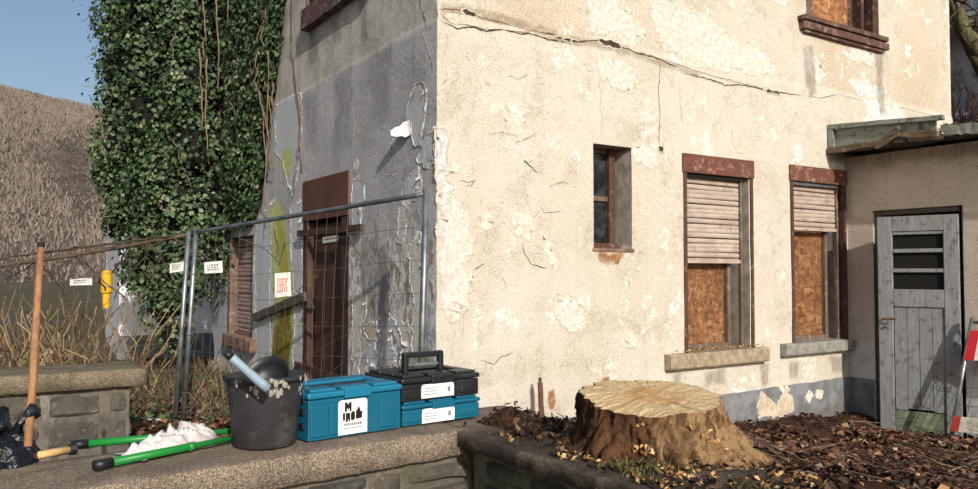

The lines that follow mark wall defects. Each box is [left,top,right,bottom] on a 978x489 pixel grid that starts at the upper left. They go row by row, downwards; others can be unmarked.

crack [418,0,932,154]
damp [270,200,294,365]
peeling [351,81,497,375]
crack [487,131,571,218]
peeling [509,207,561,274]
flaking render [756,383,824,419]